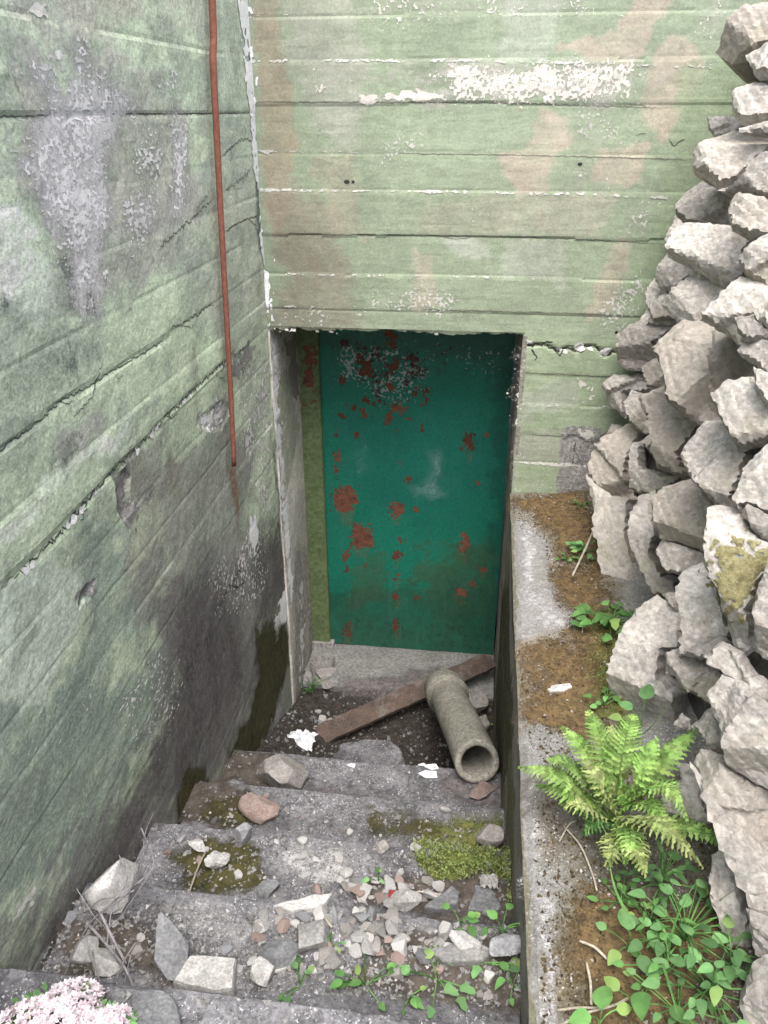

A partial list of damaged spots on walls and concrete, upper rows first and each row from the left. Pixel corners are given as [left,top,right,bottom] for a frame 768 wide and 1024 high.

peeling [358,53,673,146]
crack [0,303,212,452]
peeling [197,395,228,432]
rust [339,329,432,432]
crack [519,339,615,377]
crack [4,354,232,587]
spalling [114,460,154,531]
rust [317,395,375,573]
rust [392,537,406,601]
rust [387,501,419,519]
rust [457,531,471,553]
peeling [505,426,608,493]